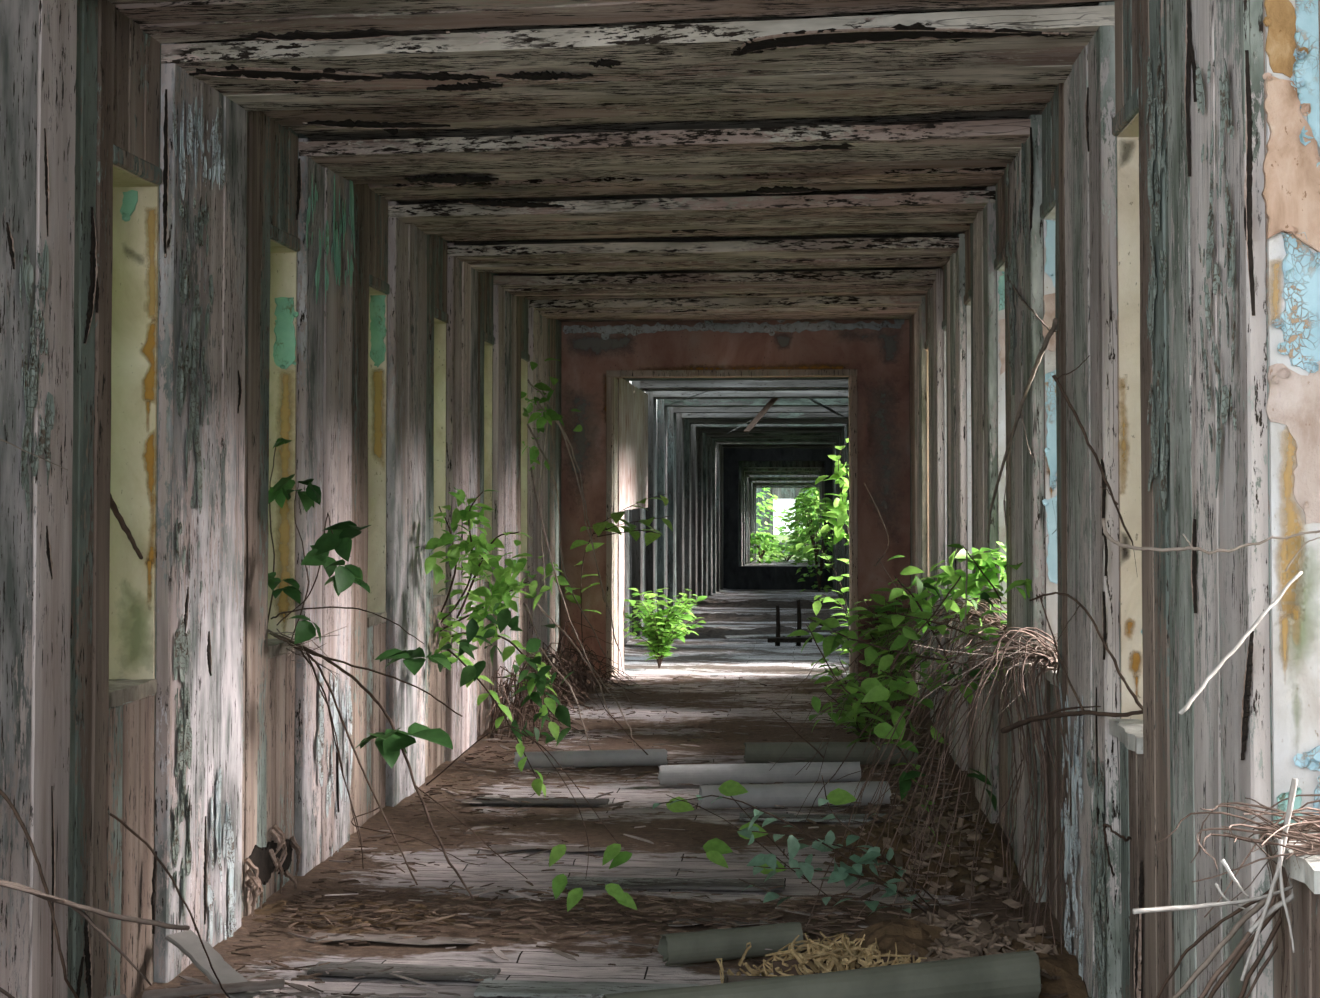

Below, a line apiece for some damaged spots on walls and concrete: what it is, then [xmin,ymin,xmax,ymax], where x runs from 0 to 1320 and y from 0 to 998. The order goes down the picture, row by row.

crack [1184,0,1197,177]
flaking render [1261,0,1320,524]
peeling [1273,745,1320,824]